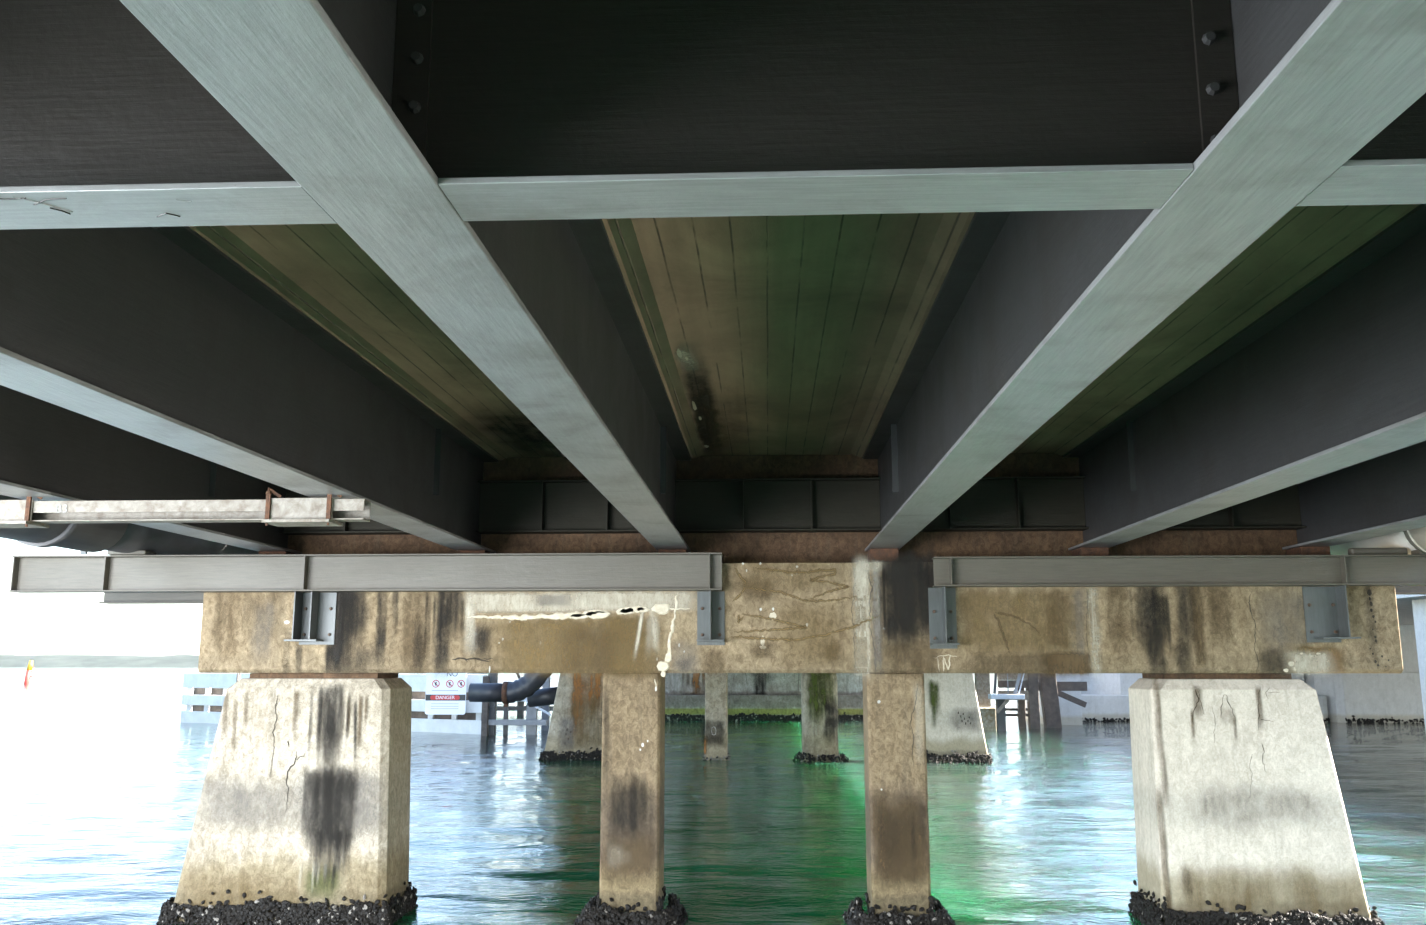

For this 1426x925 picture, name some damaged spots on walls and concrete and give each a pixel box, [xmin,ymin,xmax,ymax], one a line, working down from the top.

damp [687,373,732,446]
damp [326,592,460,669]
damp [472,612,656,673]
damp [865,554,934,672]
damp [294,687,367,760]
damp [1138,587,1229,909]